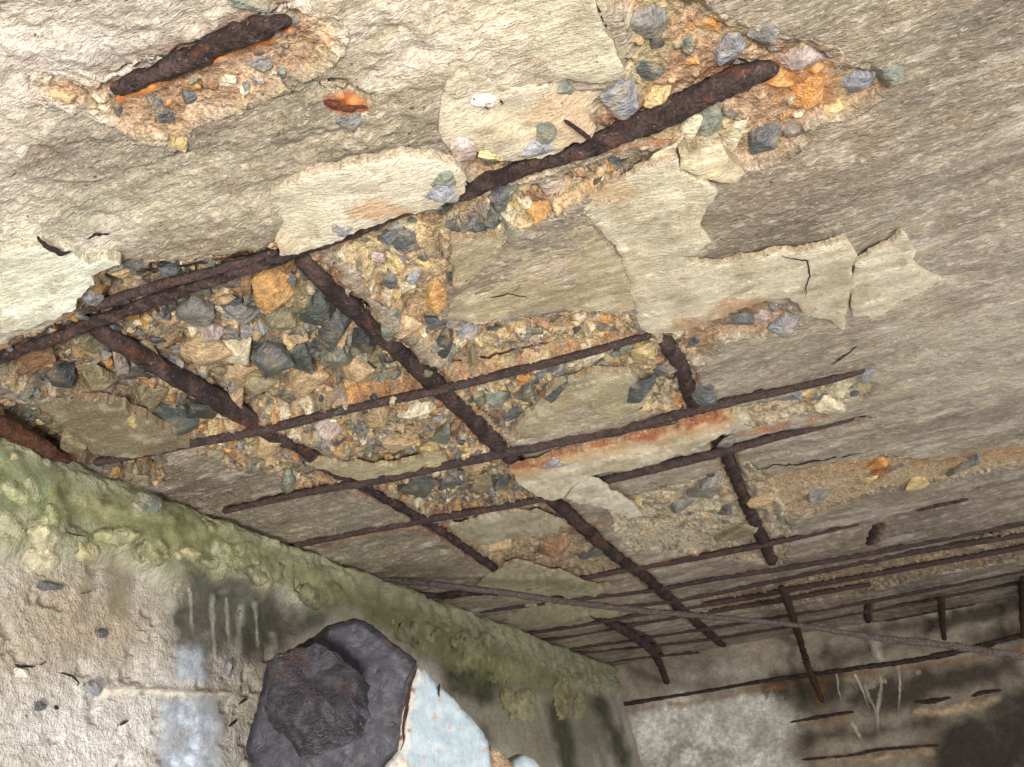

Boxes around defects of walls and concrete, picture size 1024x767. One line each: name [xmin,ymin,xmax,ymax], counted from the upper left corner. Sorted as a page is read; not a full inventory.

rust [114,77,176,102]
spalling [30,0,376,154]
rust [332,92,365,113]
crack [781,255,811,293]
spalling [107,0,1024,625]
spalling [0,237,279,488]
water stain [172,575,325,657]
water stain [101,688,227,696]
water stain [448,670,501,701]
water stain [550,705,575,767]